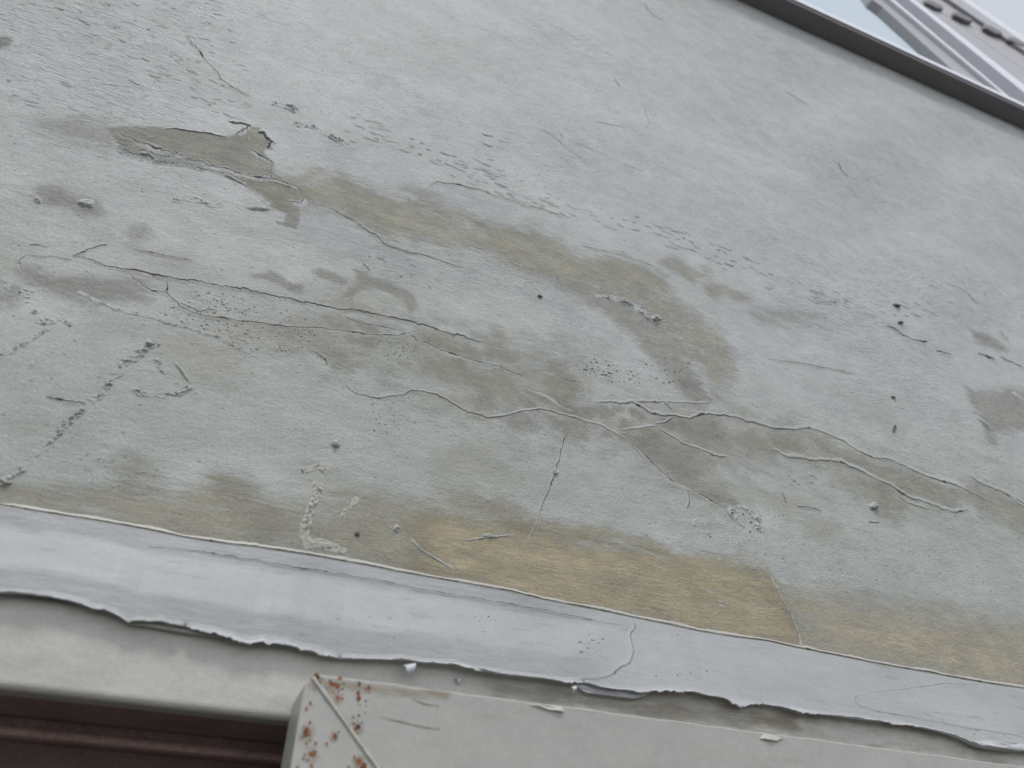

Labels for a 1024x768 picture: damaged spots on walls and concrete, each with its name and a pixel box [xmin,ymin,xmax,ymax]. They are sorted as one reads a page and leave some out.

peeling [75,0,320,228]
leakage [273,172,727,401]
crack [16,244,1024,542]
rust [296,702,340,768]
rust [313,673,372,734]
peeling [0,588,1024,752]
leakage [92,478,1024,683]